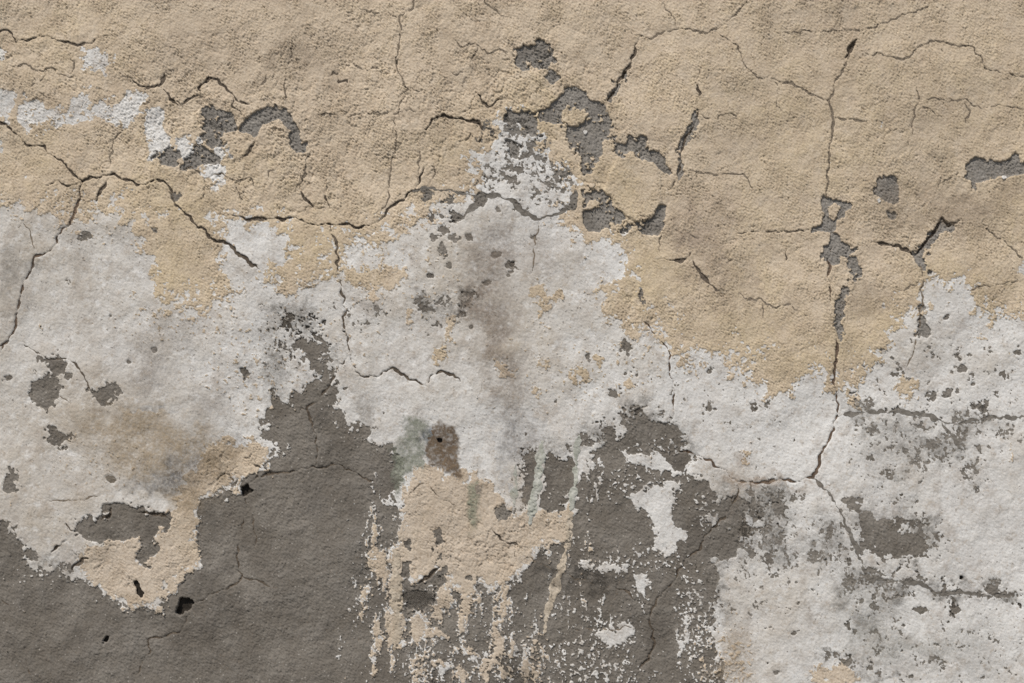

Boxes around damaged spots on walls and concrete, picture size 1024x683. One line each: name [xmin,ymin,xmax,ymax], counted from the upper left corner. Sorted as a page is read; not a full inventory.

flaking render [0,46,308,192]
crack [0,0,578,682]
flaking render [513,38,562,85]
flaking render [612,134,672,175]
flaking render [618,204,666,241]
crack [644,322,675,406]
crack [739,230,805,260]
crack [607,0,1024,199]
flaking render [811,195,862,348]
crack [877,217,960,366]
flaking render [964,153,1024,191]
crack [492,340,1024,668]